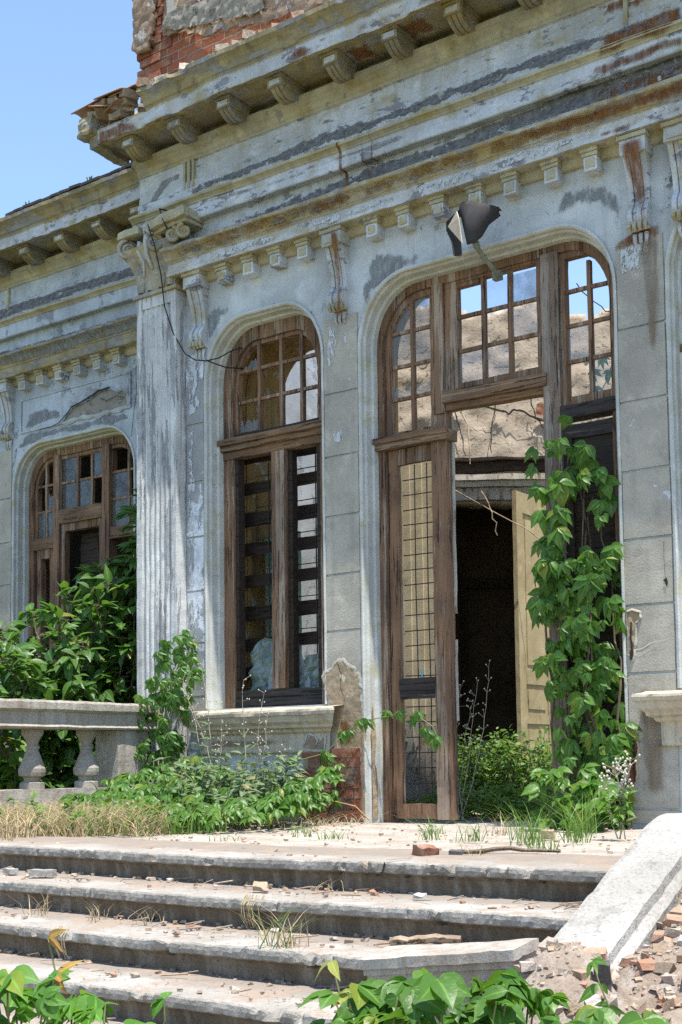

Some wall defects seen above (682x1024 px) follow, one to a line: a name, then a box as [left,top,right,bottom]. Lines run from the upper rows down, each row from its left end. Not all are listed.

corrosion [606,0,639,11]
corrosion [599,8,680,74]
corrosion [522,66,682,138]
corrosion [313,133,349,212]
corrosion [623,139,644,204]
corrosion [331,232,340,316]
peeling [617,243,642,275]
spalling [39,385,129,430]
spalling [302,658,378,821]